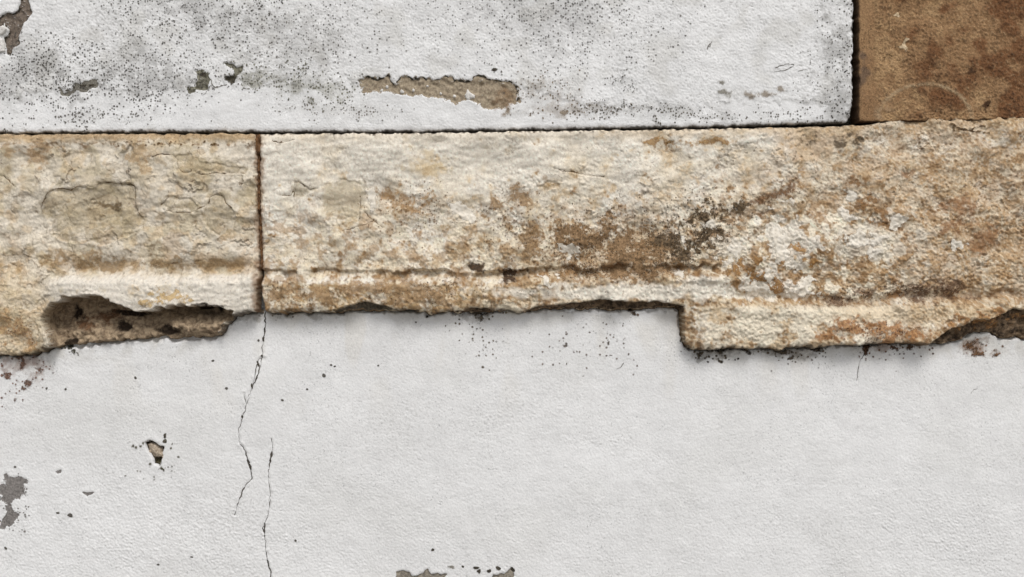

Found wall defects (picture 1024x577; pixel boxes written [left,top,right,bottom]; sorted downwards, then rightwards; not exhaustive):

flaking render [0,0,32,55]
flaking render [185,62,243,94]
flaking render [358,68,522,110]
spalling [42,295,234,348]
spalling [931,309,1024,344]
flaking render [125,433,179,480]
crack [234,313,273,577]
flaking render [0,466,30,533]
flaking render [396,565,515,577]